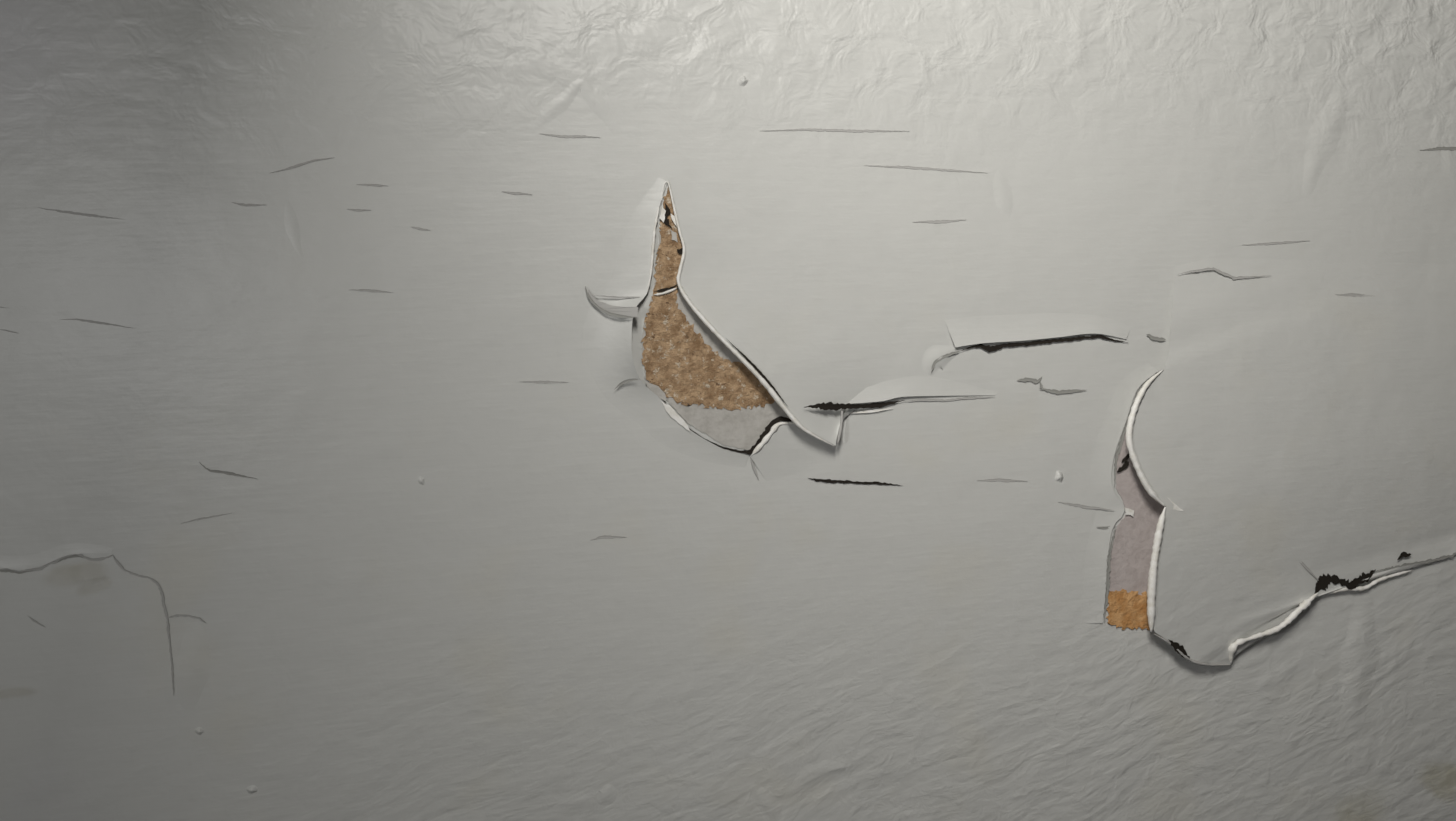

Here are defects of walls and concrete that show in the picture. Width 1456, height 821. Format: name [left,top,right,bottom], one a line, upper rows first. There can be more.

peeling [583,175,903,482]
crack [804,313,1166,413]
peeling [1082,258,1456,667]
crack [0,543,206,695]